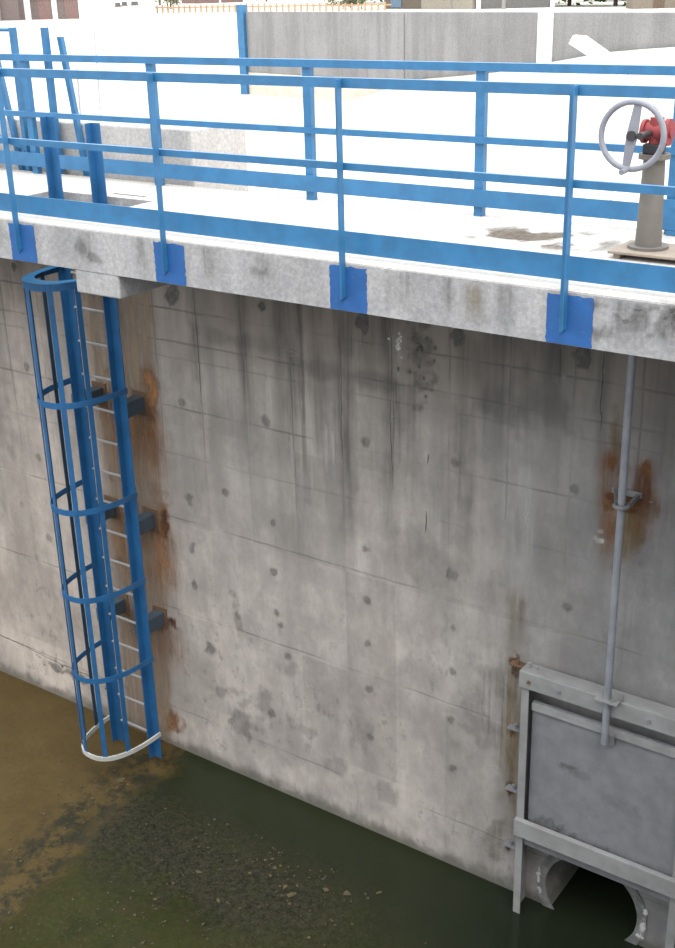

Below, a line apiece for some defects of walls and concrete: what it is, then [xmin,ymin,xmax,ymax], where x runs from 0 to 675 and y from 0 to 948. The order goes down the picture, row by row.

rust [88,295,146,729]
rust [117,291,179,734]
rust [602,463,656,541]